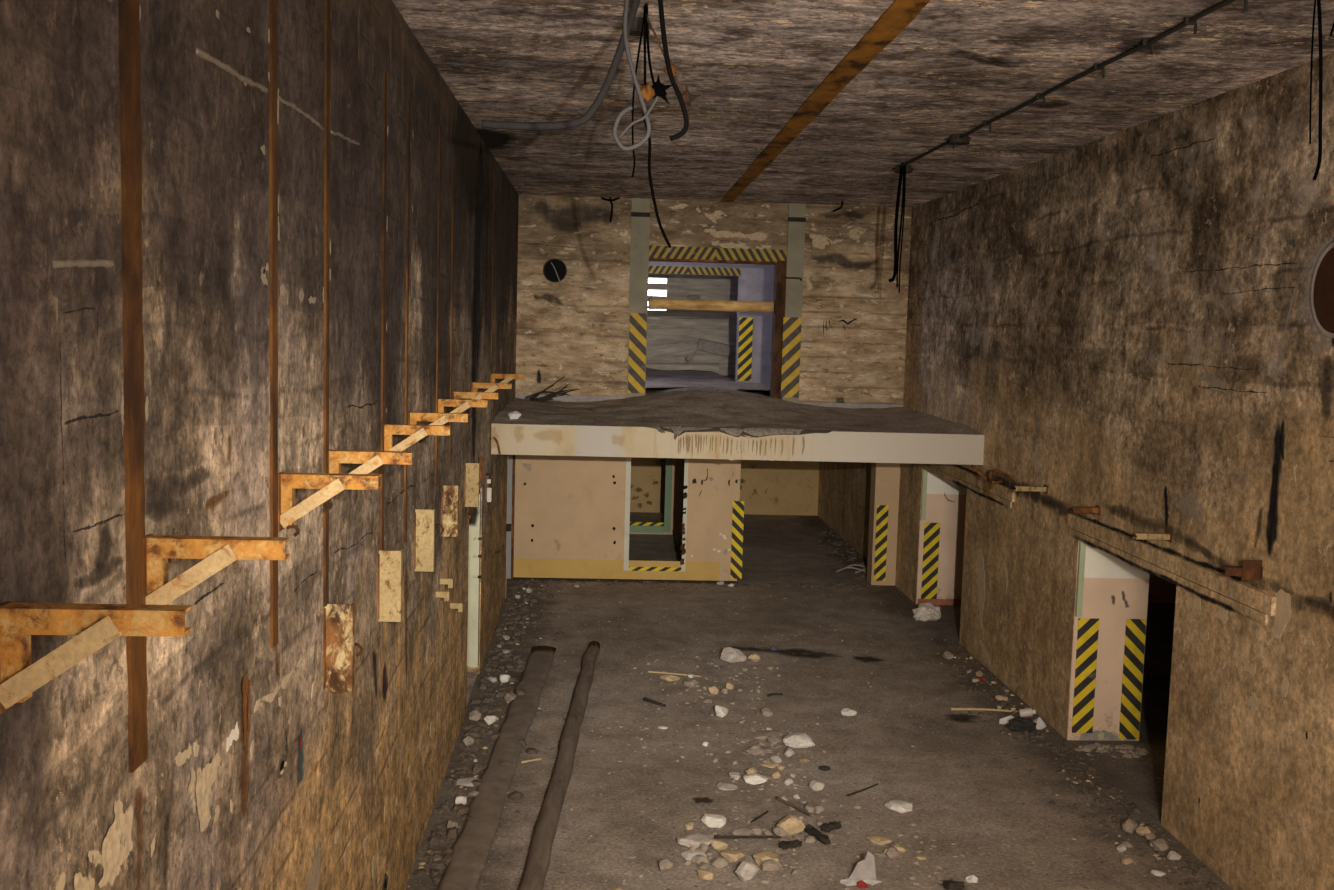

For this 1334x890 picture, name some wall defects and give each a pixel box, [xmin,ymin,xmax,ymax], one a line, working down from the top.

spalling [655,425,832,441]